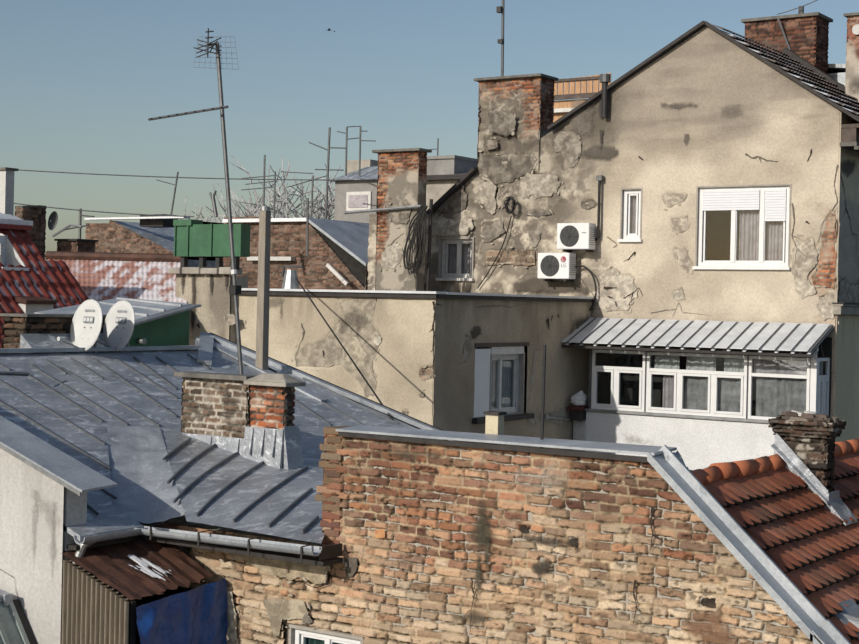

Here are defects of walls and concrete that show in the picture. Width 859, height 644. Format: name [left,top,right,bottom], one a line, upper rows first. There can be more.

flaking render [432,109,565,236]
flaking render [553,131,582,167]
flaking render [658,193,690,234]
flaking render [483,230,541,268]
flaking render [594,266,640,314]
flaking render [674,246,693,274]
flaking render [789,208,859,324]
flaking render [291,297,382,397]
crack [428,301,436,368]